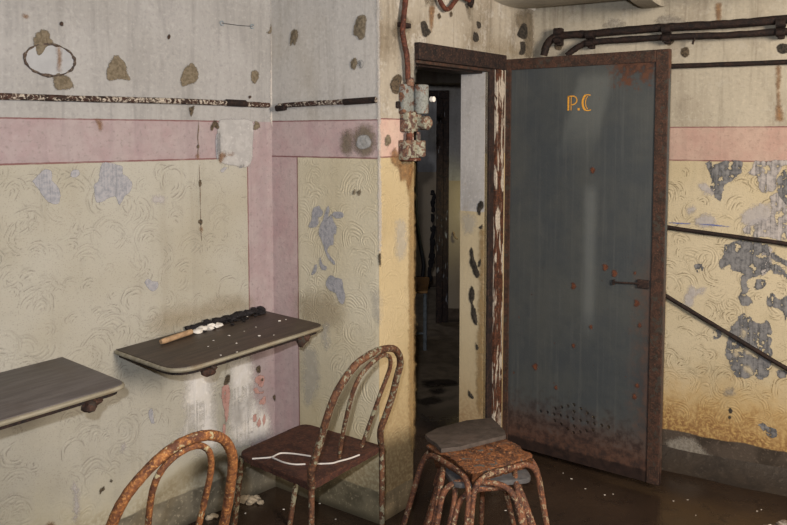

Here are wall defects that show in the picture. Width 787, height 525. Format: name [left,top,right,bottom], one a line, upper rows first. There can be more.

spalling [33,29,53,55]
spalling [53,73,74,90]
spalling [106,55,130,81]
spalling [180,63,198,86]
rust [390,74,402,94]
peeling [94,162,132,205]
peeling [309,206,345,304]
spalling [469,247,481,325]
peeling [699,160,787,380]
damp [183,372,217,436]
damp [230,359,270,446]
damp [669,438,706,455]